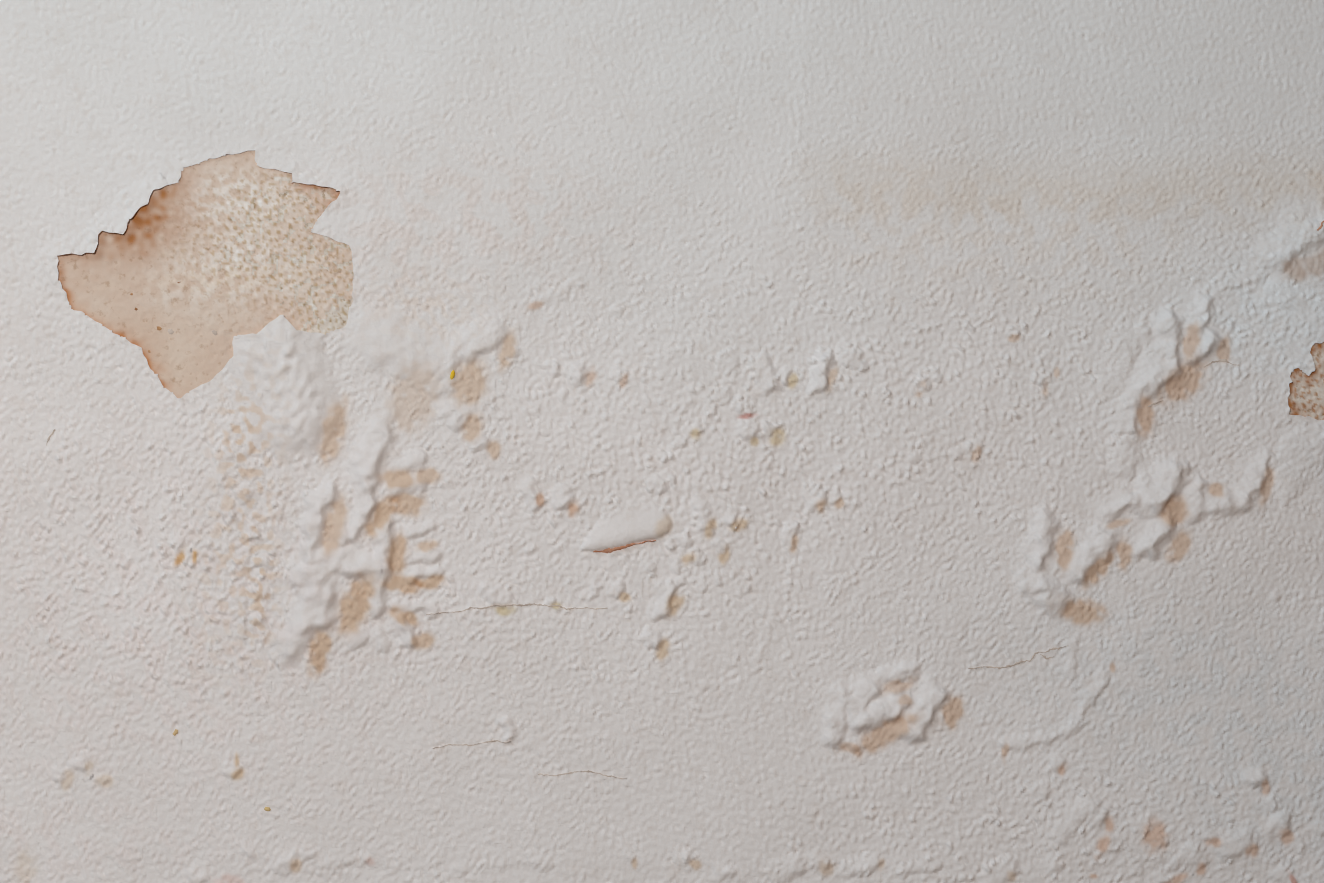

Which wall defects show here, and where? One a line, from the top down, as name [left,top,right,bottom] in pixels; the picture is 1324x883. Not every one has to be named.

peeling [31,137,361,398]
peeling [1288,342,1324,420]